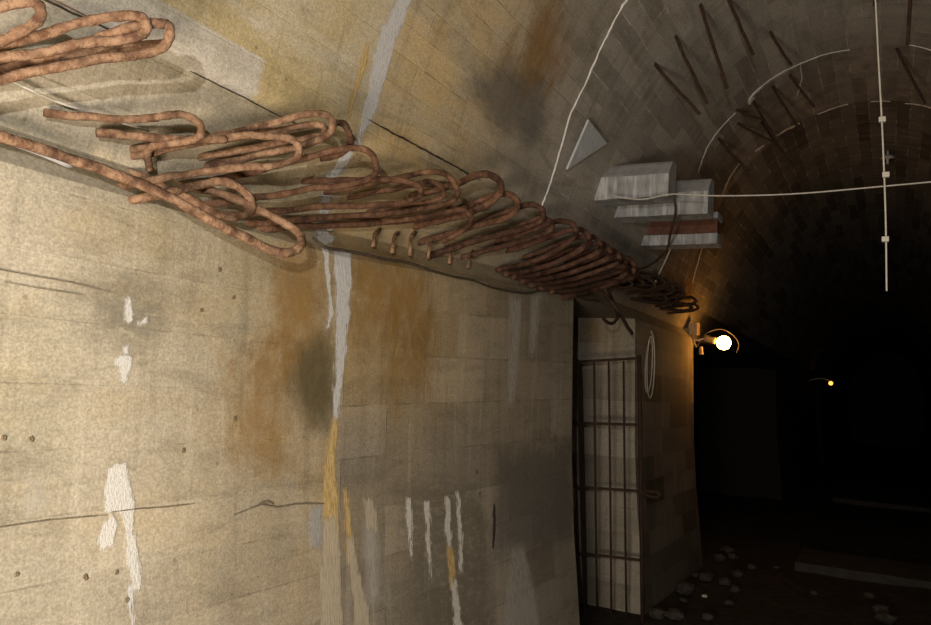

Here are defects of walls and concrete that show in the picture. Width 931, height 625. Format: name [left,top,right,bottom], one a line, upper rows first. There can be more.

damp [301,0,412,625]
crack [0,503,195,528]
crack [234,500,323,515]
damp [405,496,432,576]
damp [444,492,464,625]